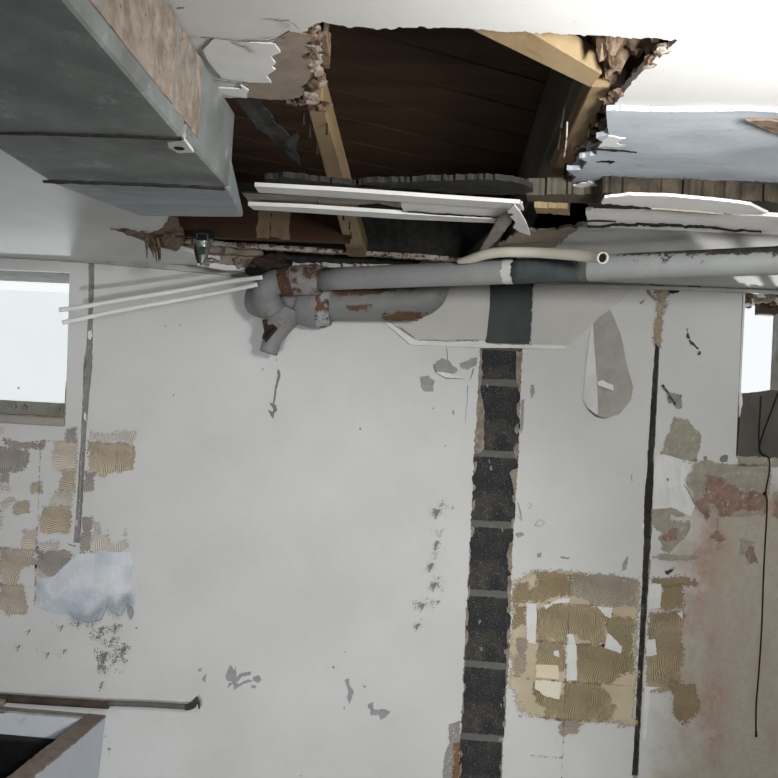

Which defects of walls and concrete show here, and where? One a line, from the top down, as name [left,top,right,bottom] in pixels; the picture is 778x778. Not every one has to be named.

peeling [203,22,331,106]
spalling [574,35,676,164]
corrosion [276,266,293,296]
corrosion [315,288,396,328]
corrosion [382,309,427,321]
peeling [583,310,633,418]
water stain [649,507,699,588]
peeling [648,584,661,609]
peeling [526,598,570,644]
peeling [604,633,622,653]
peeling [535,634,578,699]
water stain [668,680,701,726]